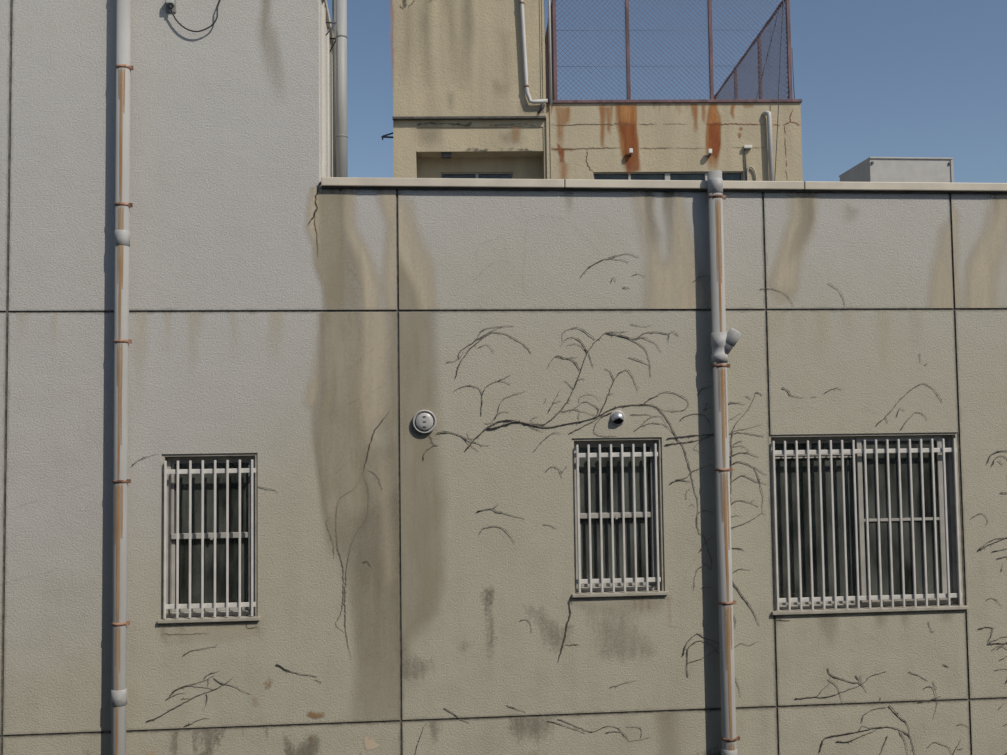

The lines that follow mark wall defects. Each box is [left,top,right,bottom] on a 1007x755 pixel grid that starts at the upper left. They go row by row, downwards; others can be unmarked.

rust [600,105,638,172]
rust [692,104,720,164]
water stain [772,192,815,294]
water stain [932,194,1006,308]
water stain [308,187,439,693]